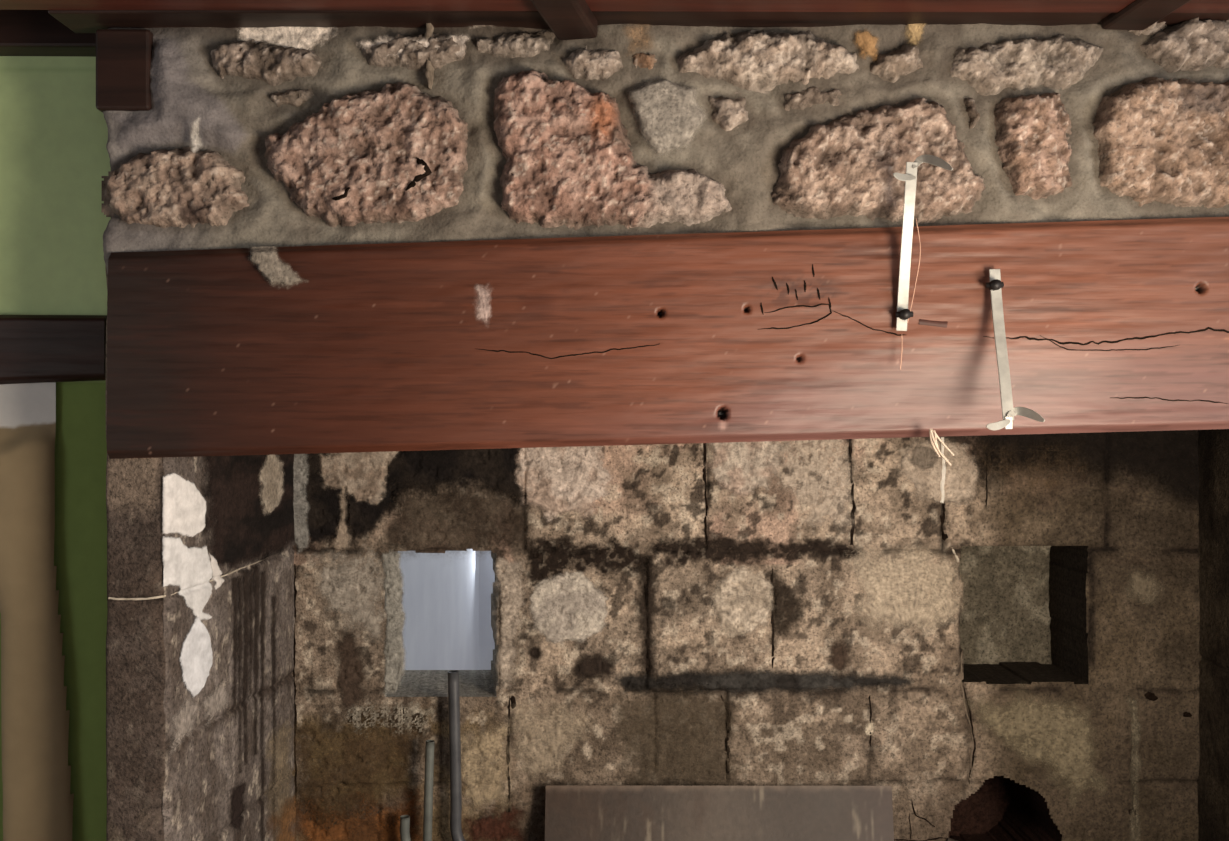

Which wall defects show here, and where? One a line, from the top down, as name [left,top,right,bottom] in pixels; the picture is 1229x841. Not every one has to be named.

crack [757,303,904,336]
crack [479,344,659,359]
crack [983,327,1229,351]
crack [1114,396,1228,404]
peeling [162,473,224,697]
damp [170,555,435,841]
corrosion [272,789,423,841]